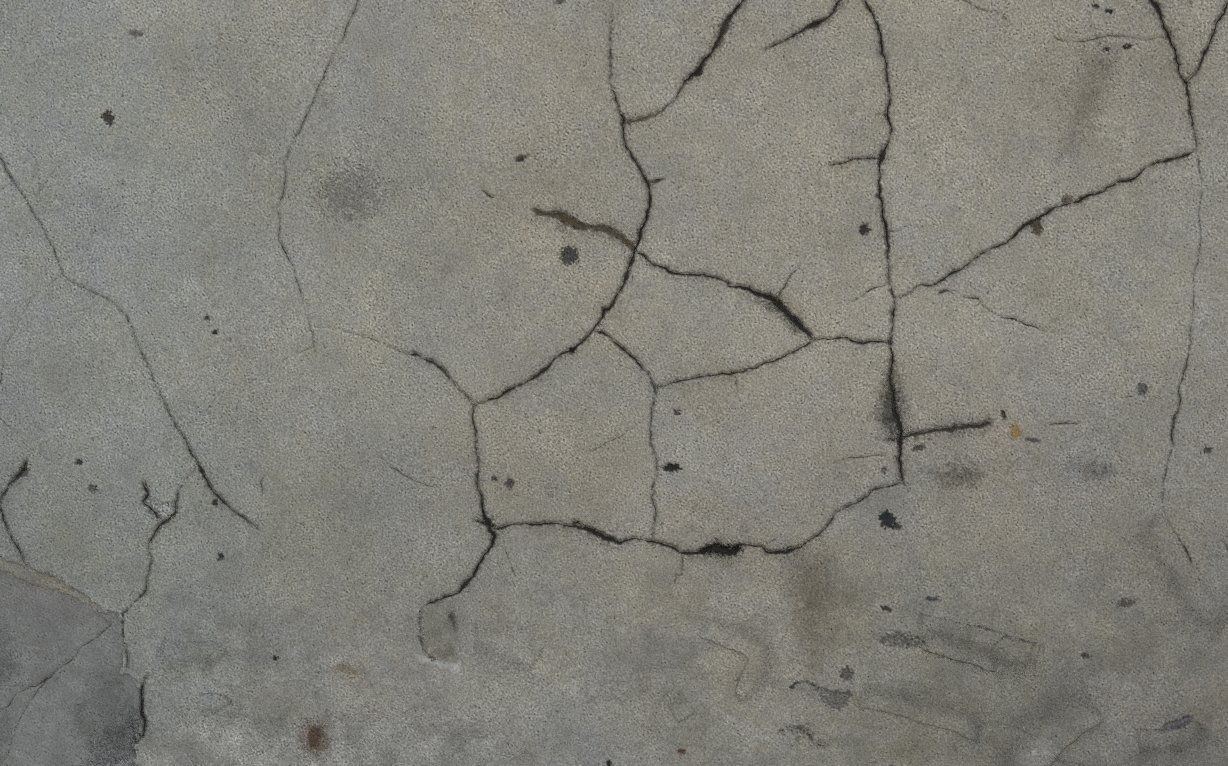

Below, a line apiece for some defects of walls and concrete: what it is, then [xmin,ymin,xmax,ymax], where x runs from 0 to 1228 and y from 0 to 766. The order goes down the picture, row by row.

crack [301,0,1228,605]
crack [0,453,47,558]
crack [8,405,259,745]